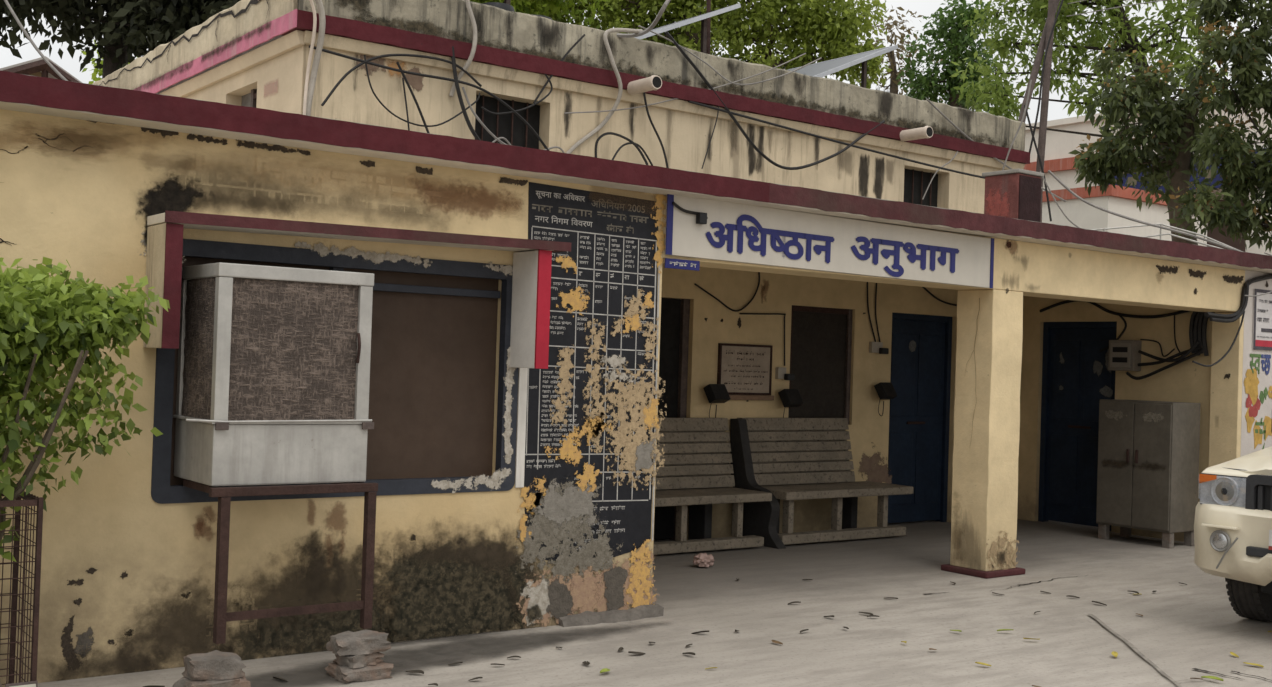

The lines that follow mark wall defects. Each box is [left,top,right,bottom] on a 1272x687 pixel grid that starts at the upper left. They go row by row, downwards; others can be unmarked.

damp [336,0,1007,147]
crack [0,133,93,183]
damp [747,124,764,175]
damp [859,155,885,199]
peeling [294,241,433,268]
peeling [431,347,517,493]
peeling [515,255,667,629]
damp [303,534,344,598]
damp [380,532,645,674]
damp [246,662,337,687]